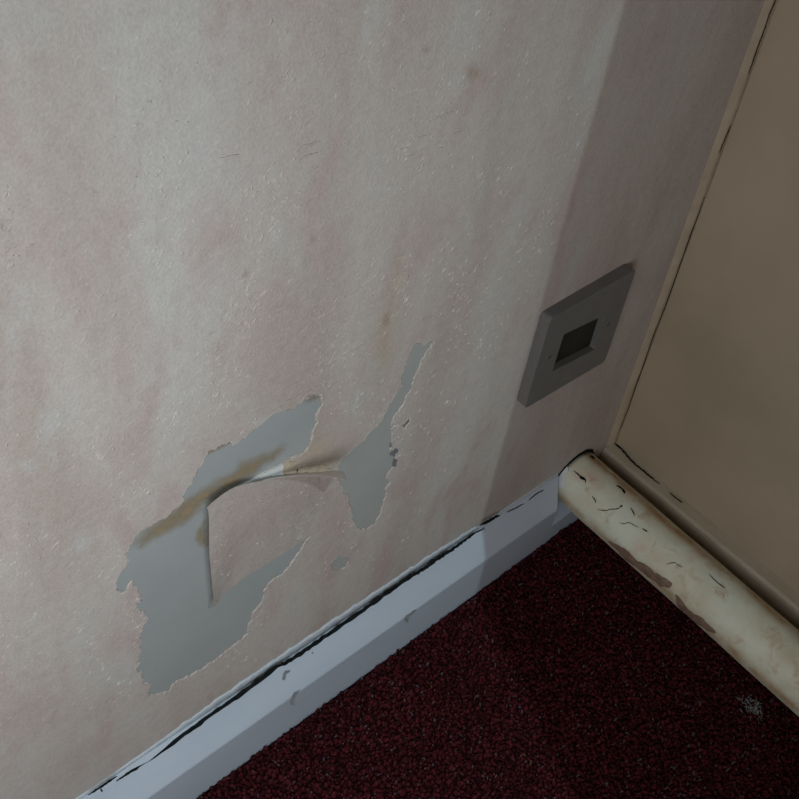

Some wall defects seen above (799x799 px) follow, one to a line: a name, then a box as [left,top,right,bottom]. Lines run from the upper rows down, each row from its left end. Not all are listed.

crack [748,0,776,74]
peeling [116,341,436,696]
crack [88,490,544,795]
crack [558,449,647,532]
crack [615,197,705,503]